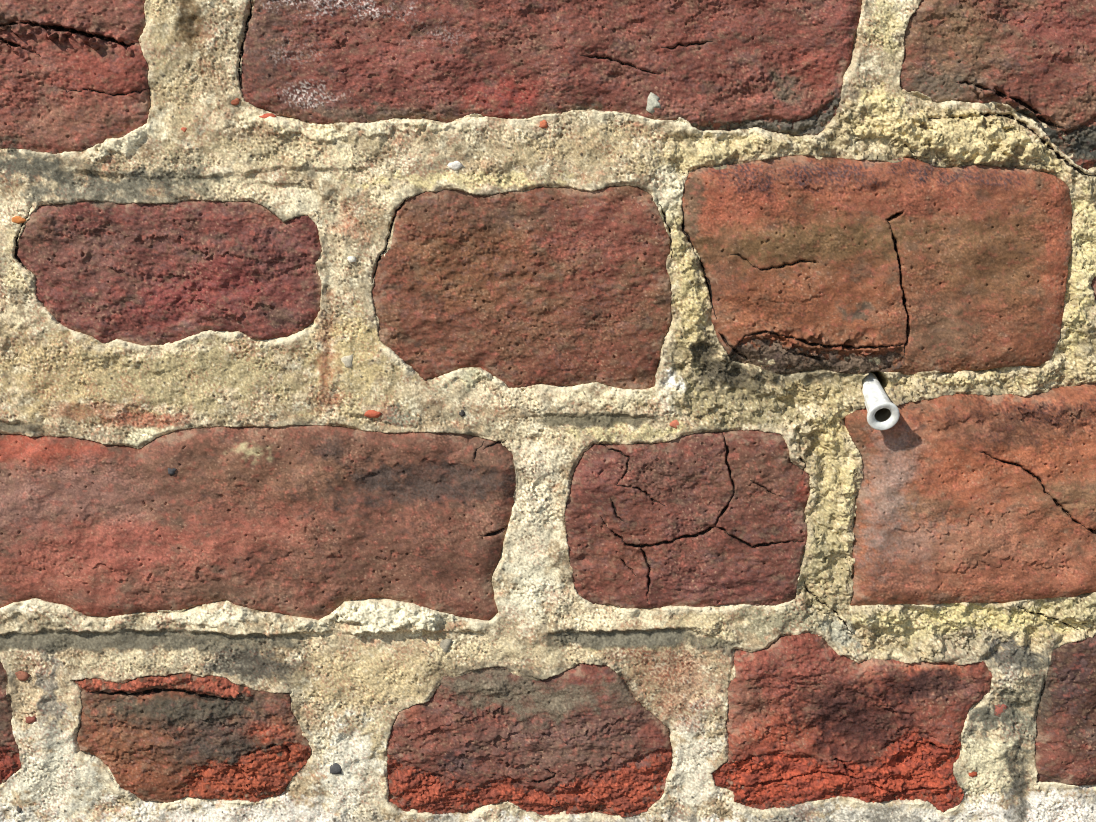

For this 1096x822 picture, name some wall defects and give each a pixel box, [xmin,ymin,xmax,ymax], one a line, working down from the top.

crack [0,22,141,56]
crack [66,88,150,96]
crack [927,81,1096,176]
crack [657,199,909,361]
crack [599,433,804,601]
crack [981,452,1096,534]
crack [804,581,852,634]
spalling [75,673,253,698]
spalling [0,745,21,783]
spalling [173,735,311,802]
spalling [387,747,672,818]
spalling [712,726,964,812]